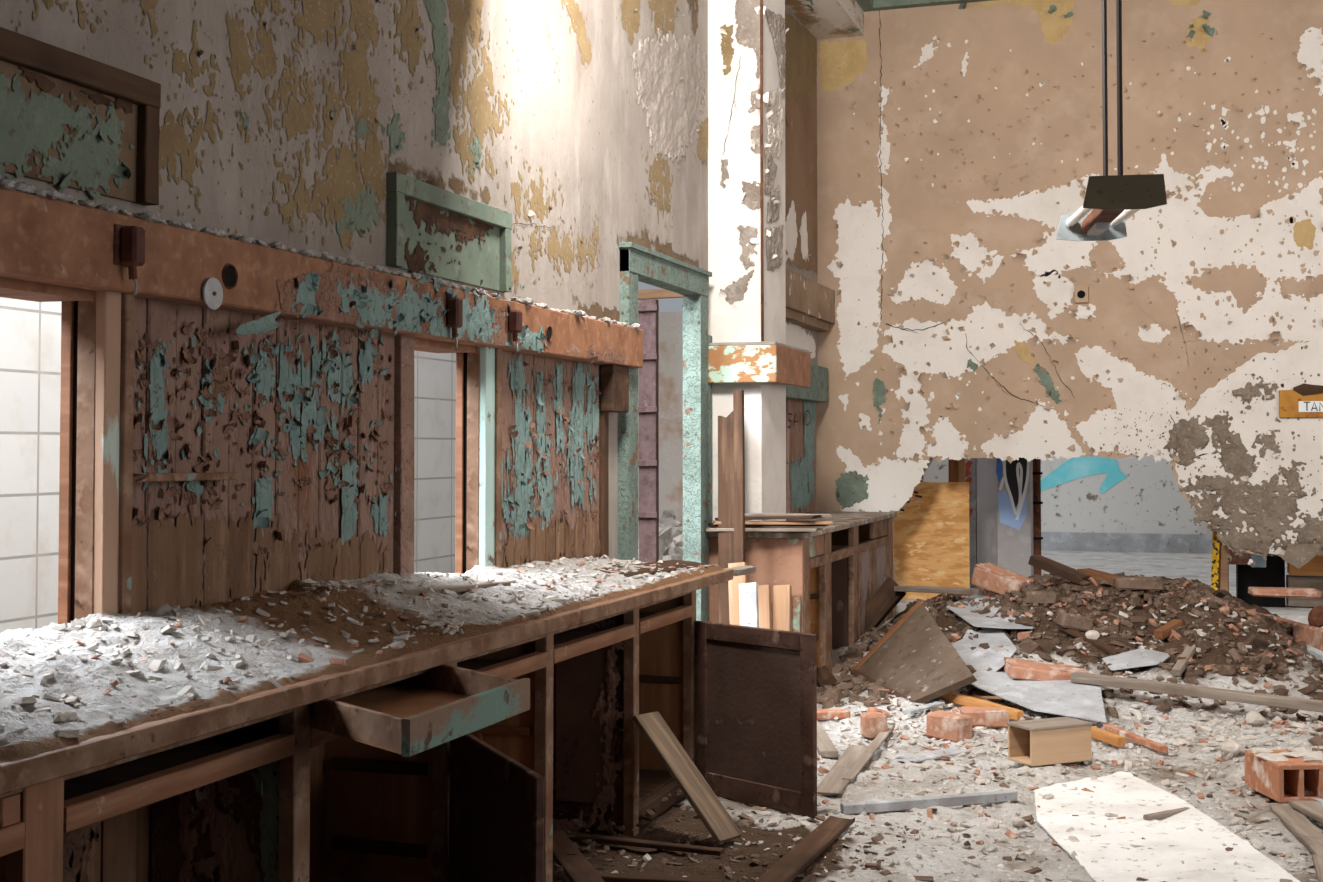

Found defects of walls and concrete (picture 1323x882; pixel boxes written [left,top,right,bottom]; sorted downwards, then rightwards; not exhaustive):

peeling [11,0,121,50]
peeling [0,72,135,203]
peeling [123,0,691,615]
peeling [694,0,1323,569]
peeling [63,826,101,882]